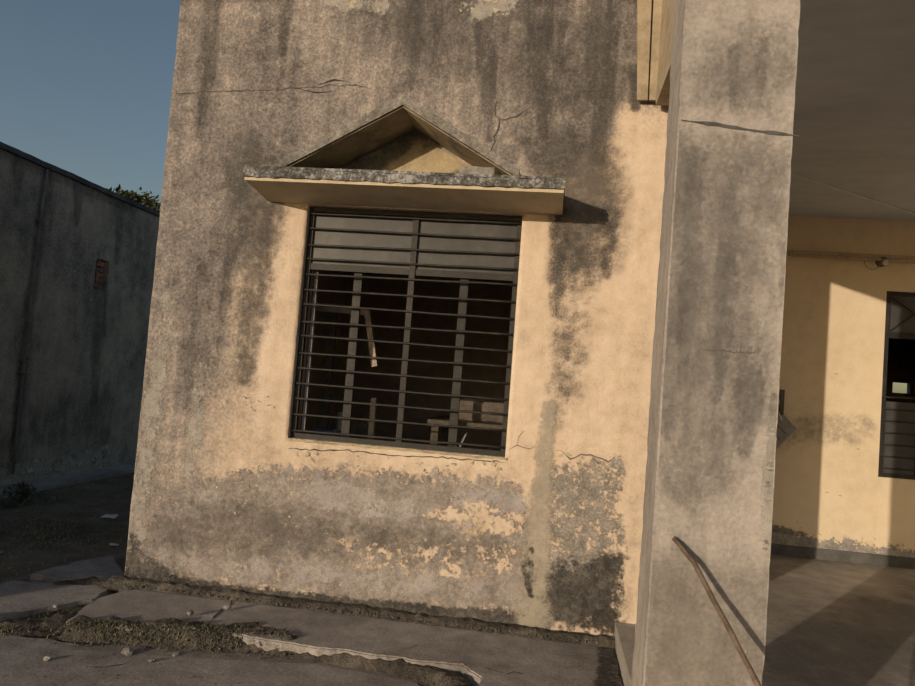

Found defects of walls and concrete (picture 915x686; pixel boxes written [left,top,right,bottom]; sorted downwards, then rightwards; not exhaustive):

flaking render [319,0,389,15]
flaking render [459,0,516,21]
crack [178,79,367,94]
crack [491,101,525,150]
crack [681,119,799,136]
water stain [520,134,622,298]
water stain [228,135,282,383]
crack [559,450,621,466]
peeling [761,393,915,558]
peeling [137,448,626,618]